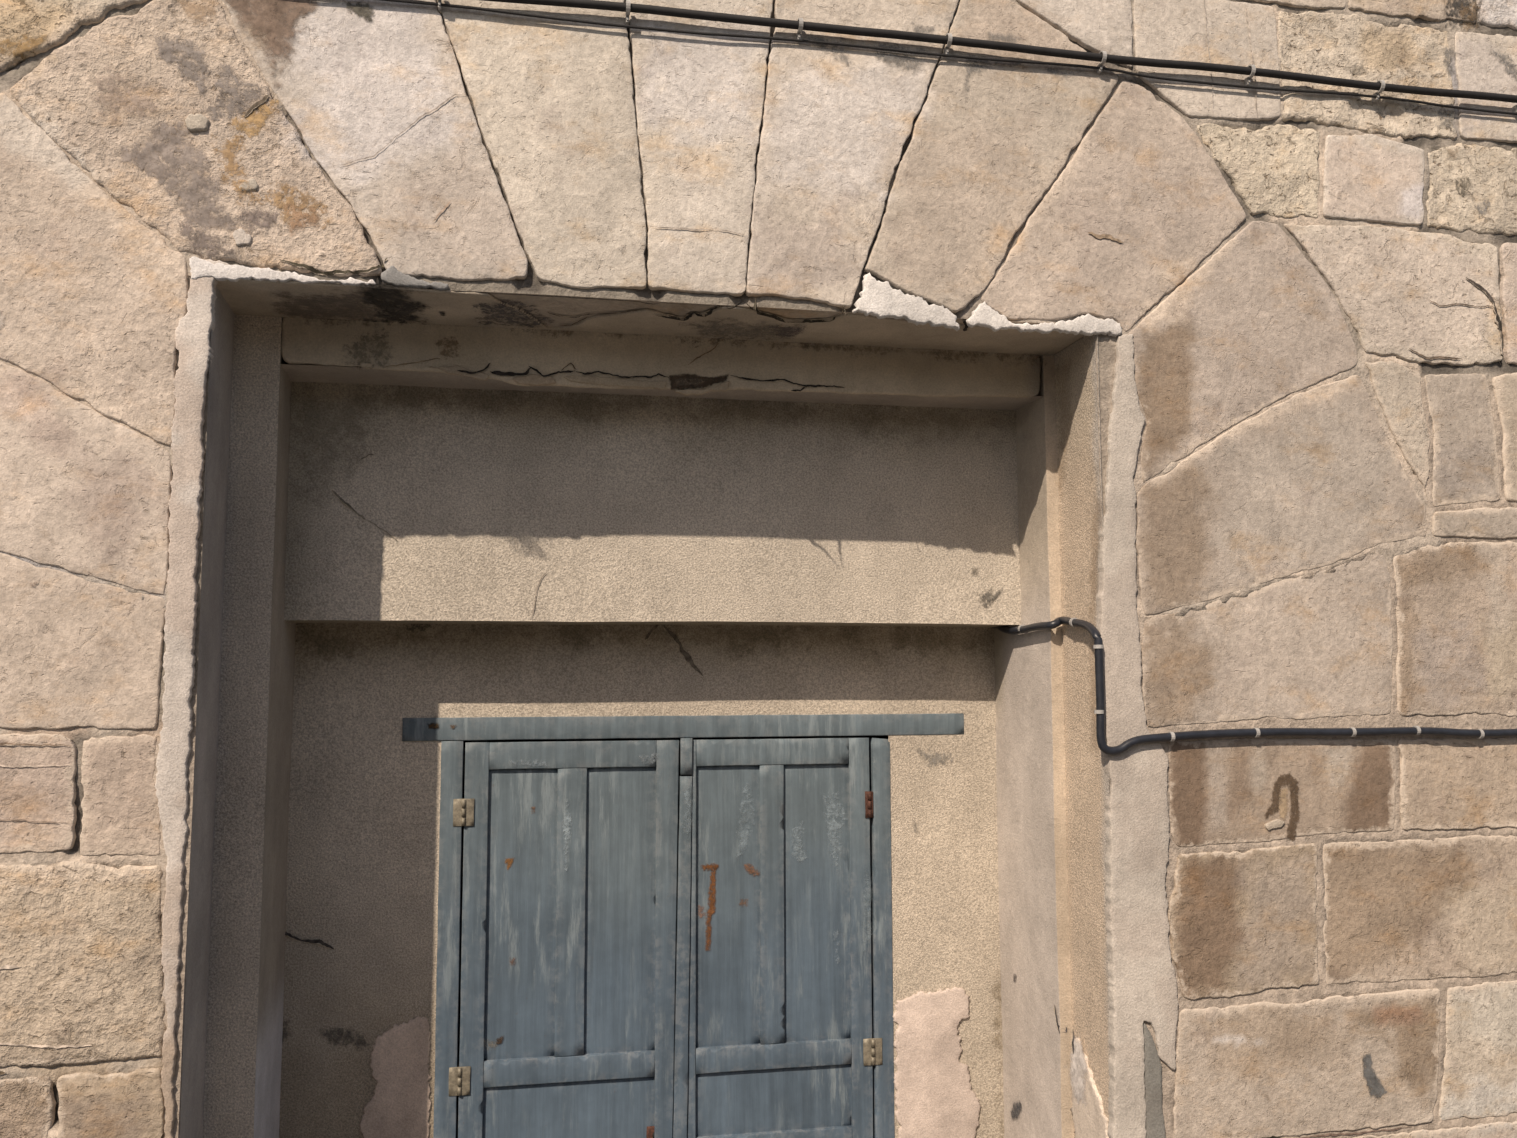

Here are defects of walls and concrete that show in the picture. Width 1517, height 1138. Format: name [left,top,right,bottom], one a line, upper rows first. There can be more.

leakage [1445,0,1481,30]
leakage [277,278,445,368]
leakage [473,300,573,336]
crack [386,299,846,392]